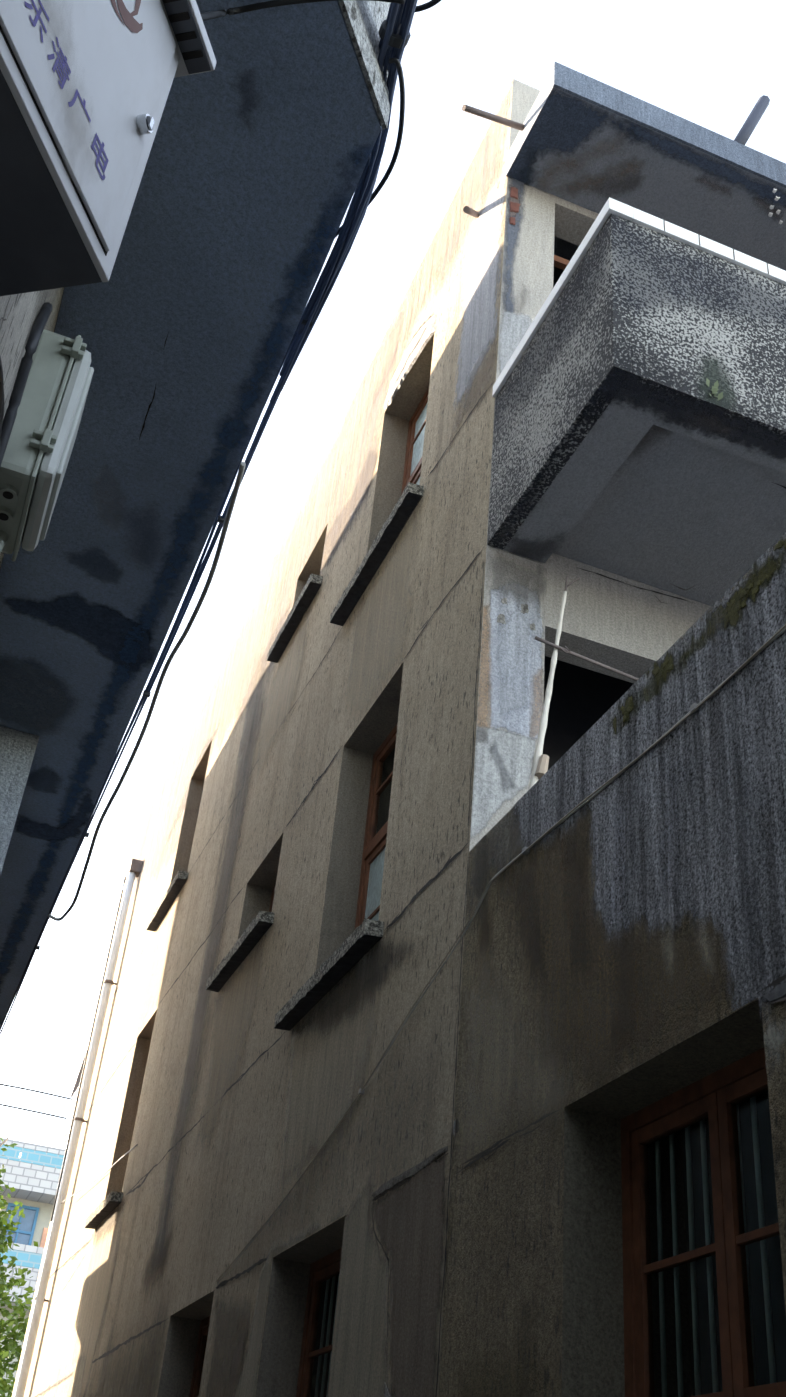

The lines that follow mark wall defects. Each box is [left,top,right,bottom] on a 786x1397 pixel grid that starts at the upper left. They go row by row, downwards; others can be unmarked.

leakage [0,199,348,985]
leakage [132,90,786,1288]